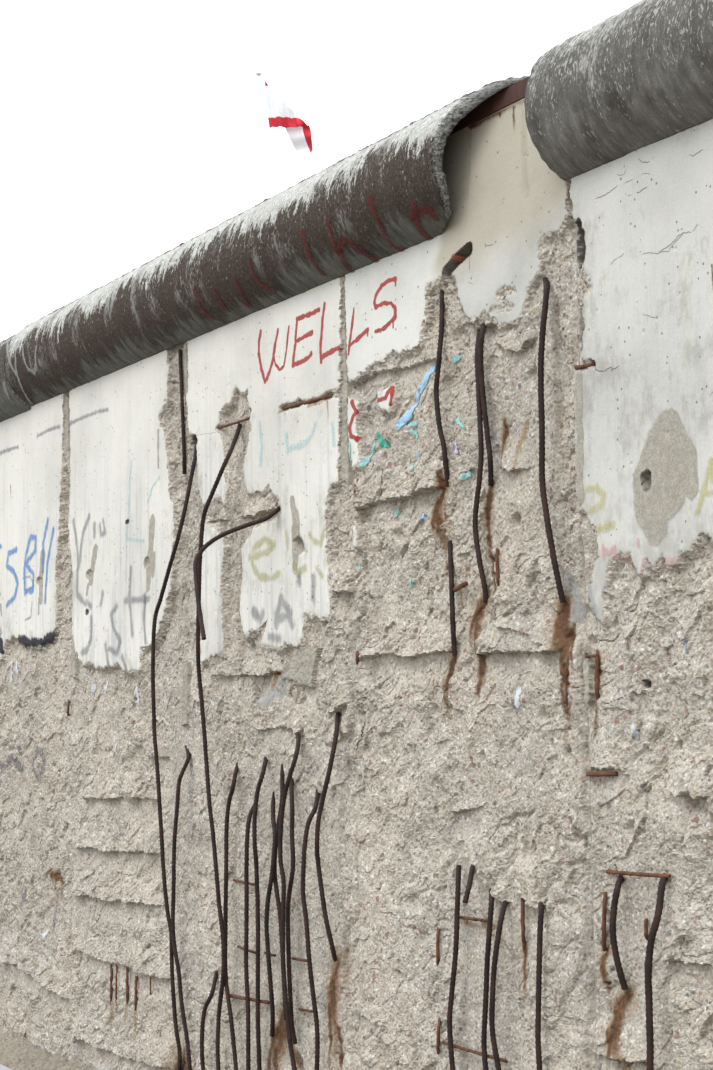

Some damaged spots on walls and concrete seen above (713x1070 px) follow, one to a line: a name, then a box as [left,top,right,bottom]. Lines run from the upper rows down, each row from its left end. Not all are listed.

spalling [565,179,574,211]
rust [431,470,447,545]
rust [485,483,496,591]
spalling [0,216,713,1070]
rust [443,651,457,706]
rust [460,589,487,695]
rust [553,597,576,718]
rust [600,947,611,988]
rust [267,1011,303,1070]
rust [327,959,344,1069]
rust [606,989,632,1070]